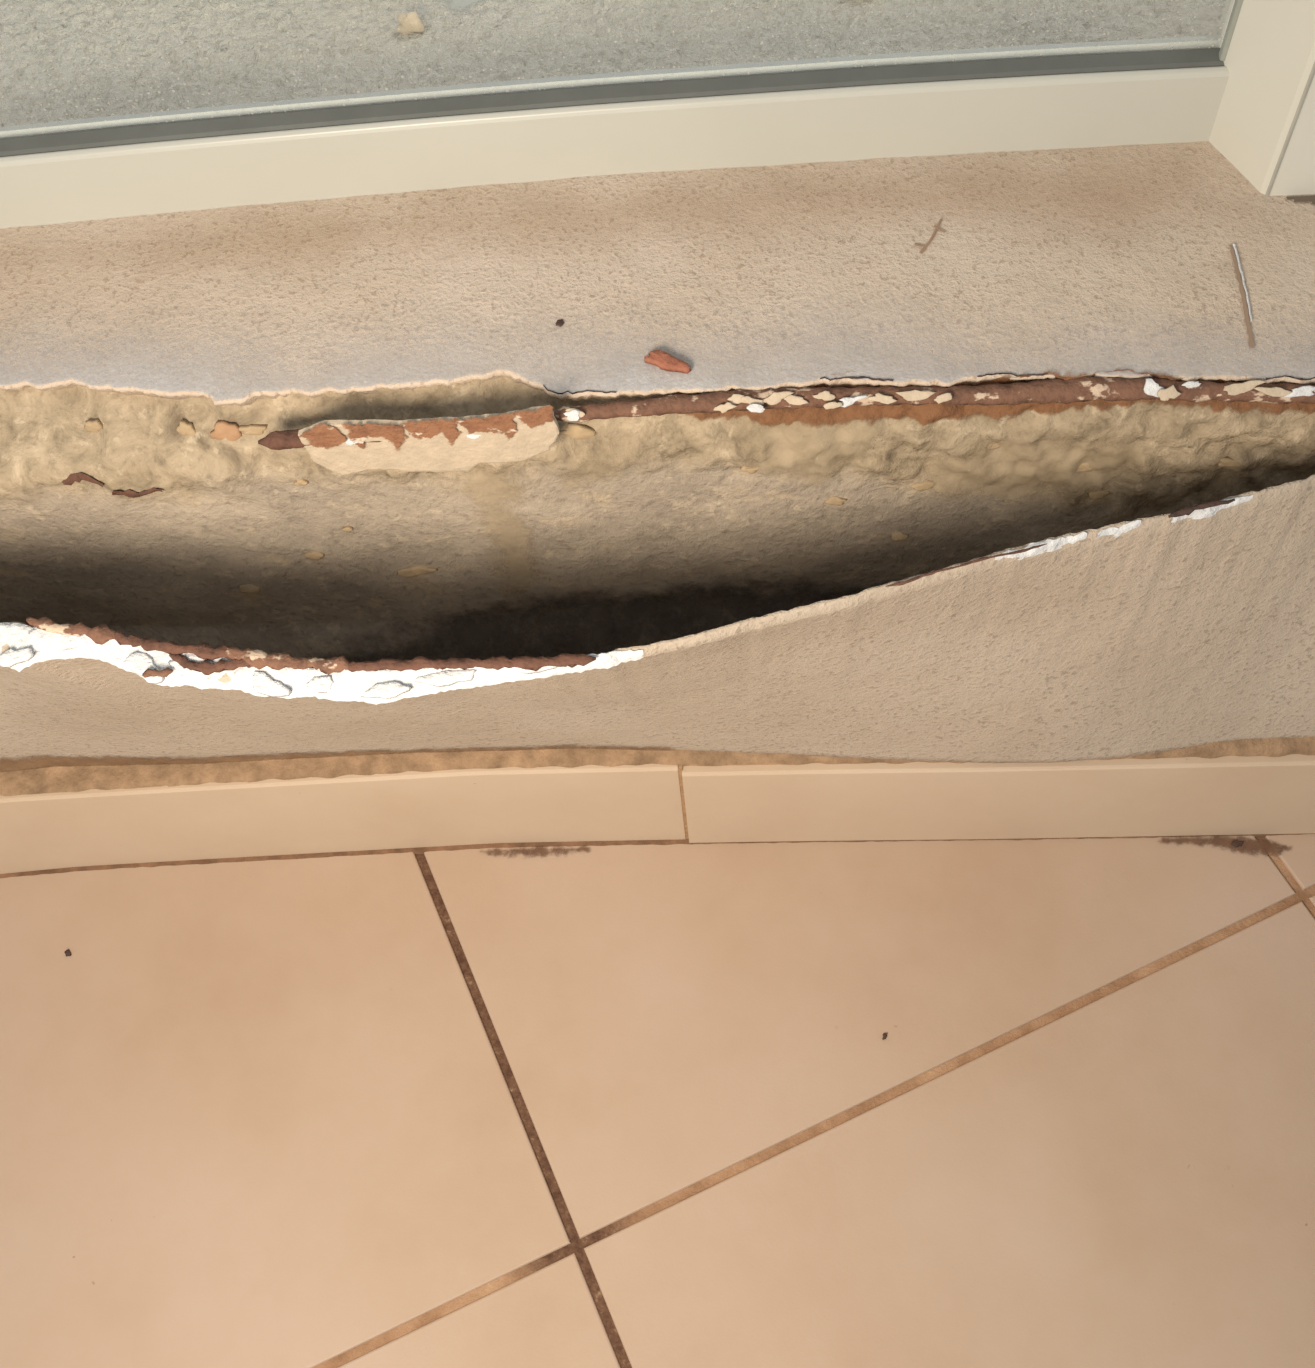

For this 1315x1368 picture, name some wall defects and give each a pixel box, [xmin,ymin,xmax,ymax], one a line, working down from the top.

rust [811,376,909,388]
rust [957,369,1182,386]
rust [299,385,616,451]
rust [686,399,1315,426]
rust [1168,499,1235,518]
spalling [0,377,1315,705]
rust [886,544,1046,587]
damp [344,583,863,662]
rust [26,617,596,678]